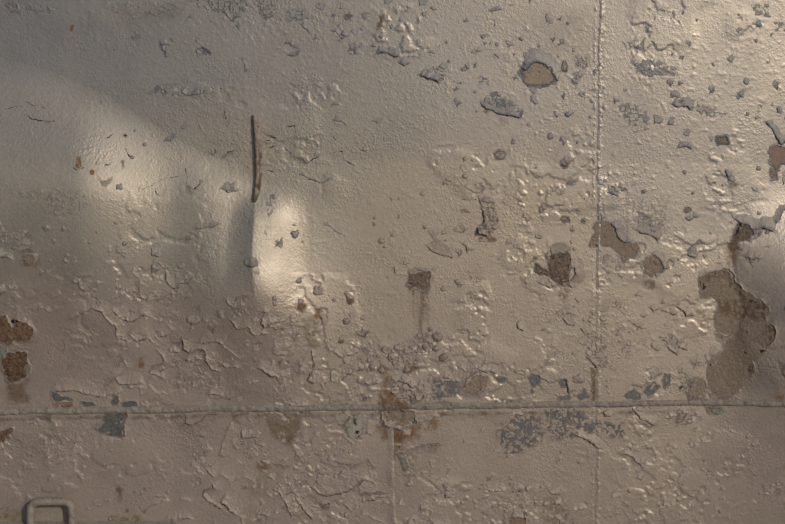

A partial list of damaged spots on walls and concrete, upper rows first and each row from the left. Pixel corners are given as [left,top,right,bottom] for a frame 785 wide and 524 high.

peeling [186,0,440,66]
peeling [416,62,464,107]
spalling [459,4,588,127]
peeling [422,164,514,258]
spalling [0,311,37,386]
peeling [44,287,312,444]
spalling [332,183,785,454]